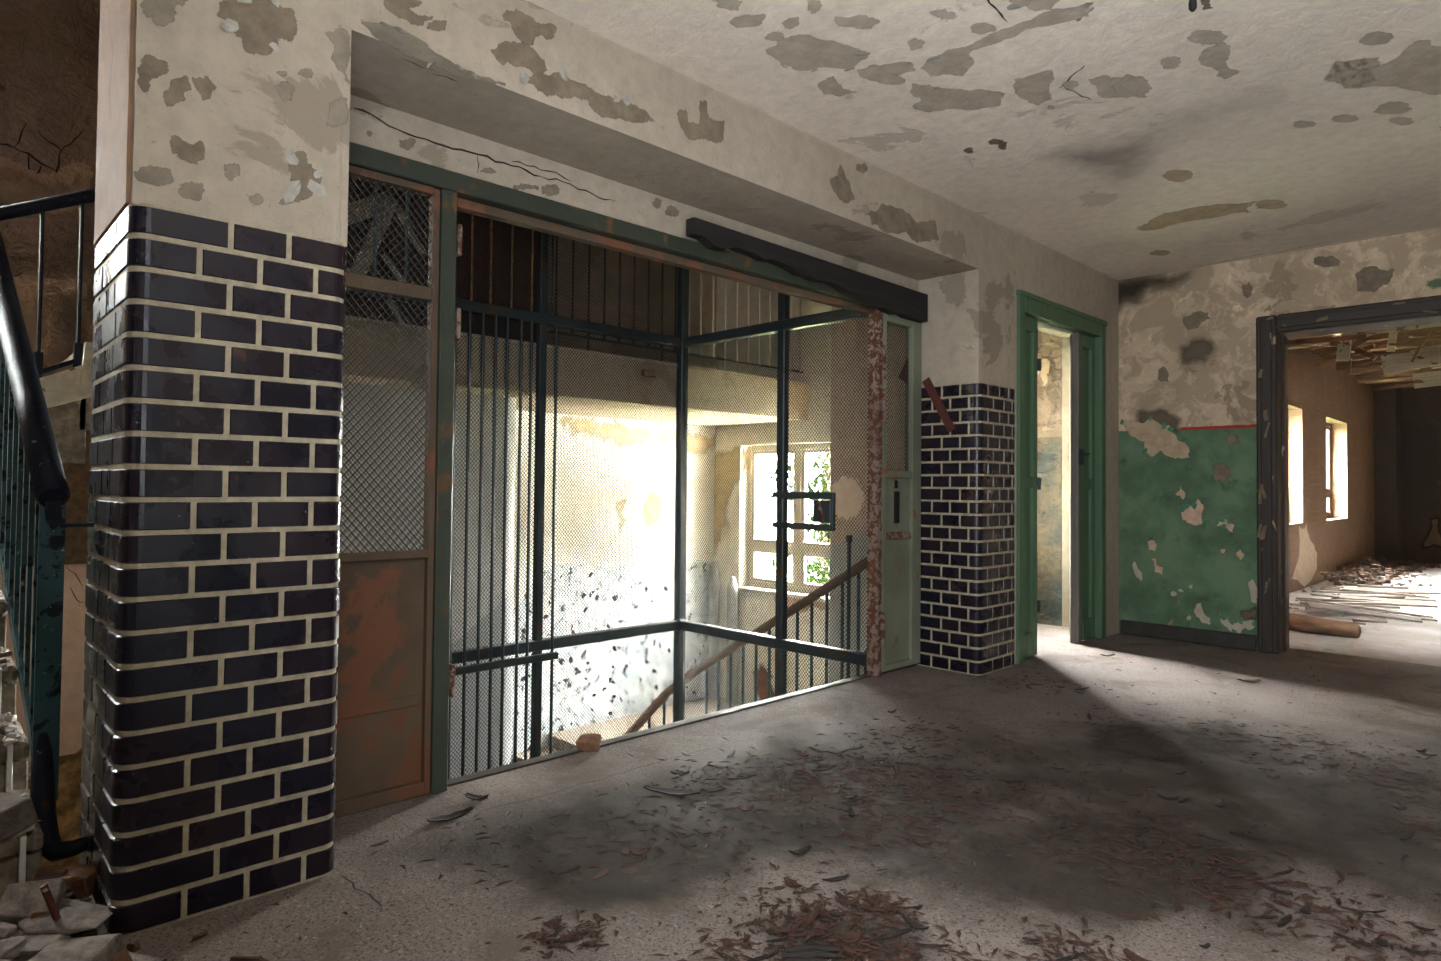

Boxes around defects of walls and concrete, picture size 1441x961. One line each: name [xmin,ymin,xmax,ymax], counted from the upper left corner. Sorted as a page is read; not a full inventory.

crack [0,43,129,174]
peeling [217,0,298,55]
flaking render [326,0,654,128]
flaking render [677,99,725,144]
peeling [712,0,1152,113]
peeling [1187,30,1240,79]
peeling [1293,31,1441,128]
crack [353,107,616,202]
peeling [1136,199,1288,231]
flaking render [1120,417,1190,459]
flaking render [1291,523,1317,587]
peeling [1170,578,1271,633]